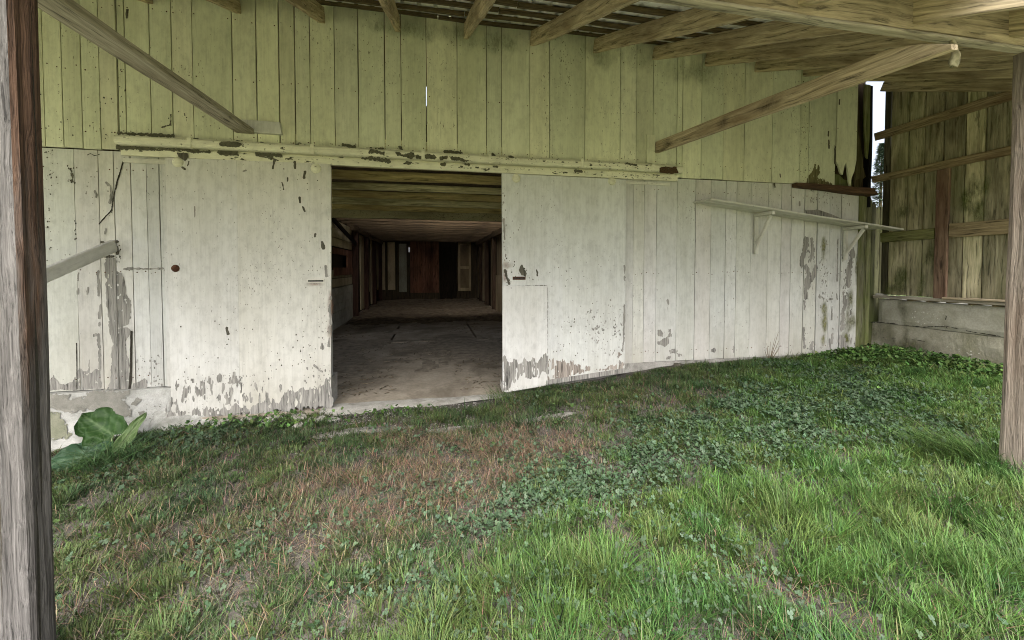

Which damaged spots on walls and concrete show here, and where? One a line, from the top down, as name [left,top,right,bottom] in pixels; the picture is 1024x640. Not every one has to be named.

crack [88,153,124,224]
peeling [339,143,517,171]
peeling [529,158,671,180]
peeling [799,146,850,209]
peeling [44,119,334,452]
peeling [800,236,855,354]
peeling [500,299,625,392]